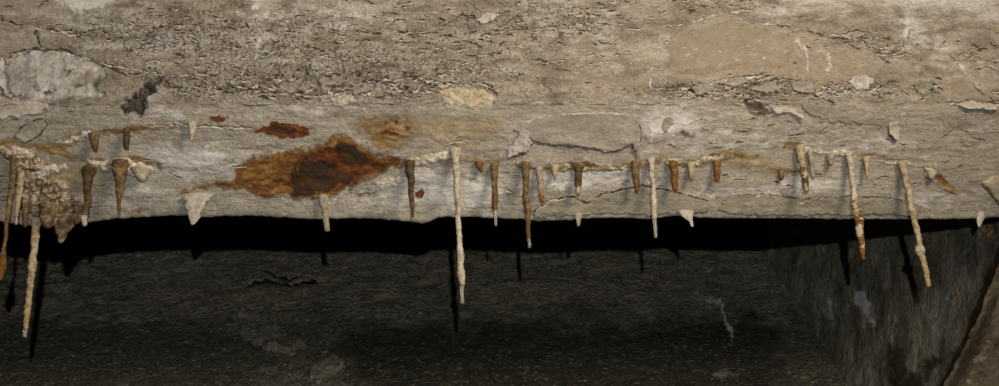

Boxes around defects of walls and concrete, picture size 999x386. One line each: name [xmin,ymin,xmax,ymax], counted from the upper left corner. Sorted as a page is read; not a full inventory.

crack [0,0,223,80]
spalling [120,80,160,115]
corrosion [0,131,105,162]
water stain [0,145,112,217]
corrosion [98,125,174,135]
water stain [126,162,157,177]
corrosion [130,157,162,171]
water stain [167,147,230,172]
corrosion [177,114,414,203]
water stain [415,119,498,166]
water stain [426,175,503,208]
water stain [516,152,788,191]